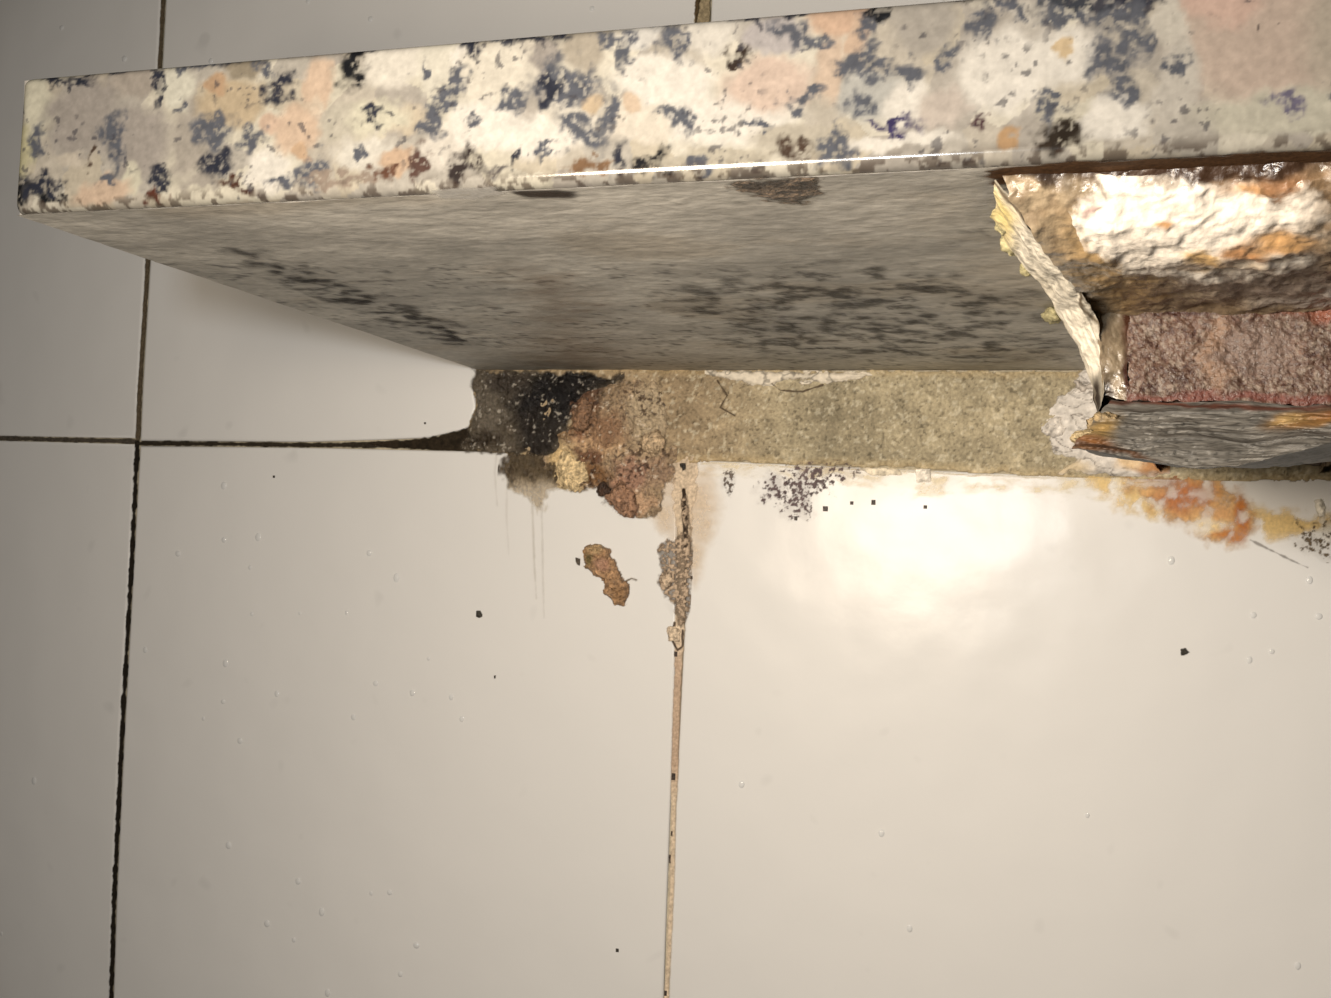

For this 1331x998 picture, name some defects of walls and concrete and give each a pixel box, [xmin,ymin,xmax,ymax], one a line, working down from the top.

damp [460,369,625,497]
peeling [1041,370,1331,477]
corrosion [1122,476,1320,543]
spalling [575,544,637,606]